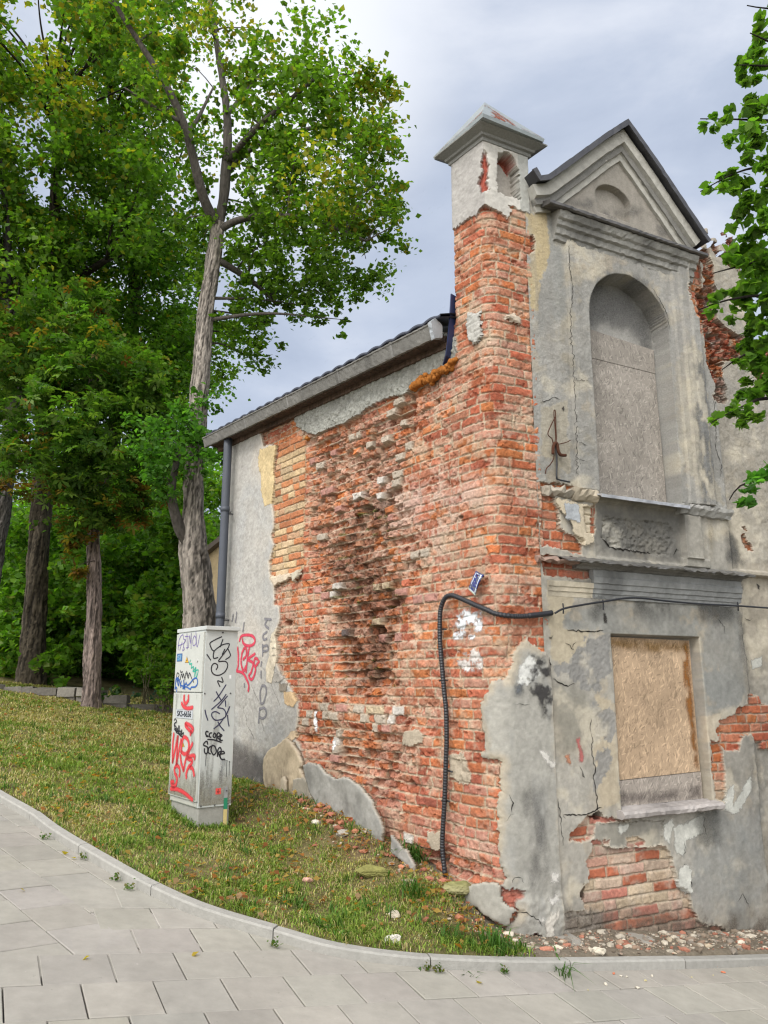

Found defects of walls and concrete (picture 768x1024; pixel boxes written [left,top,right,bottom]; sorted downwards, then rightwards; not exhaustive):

crack [542,253,585,475]
spalling [688,247,745,404]
spalling [258,151,589,928]
crack [558,720,601,845]
flaking render [710,693,768,814]
flaking render [564,810,726,933]